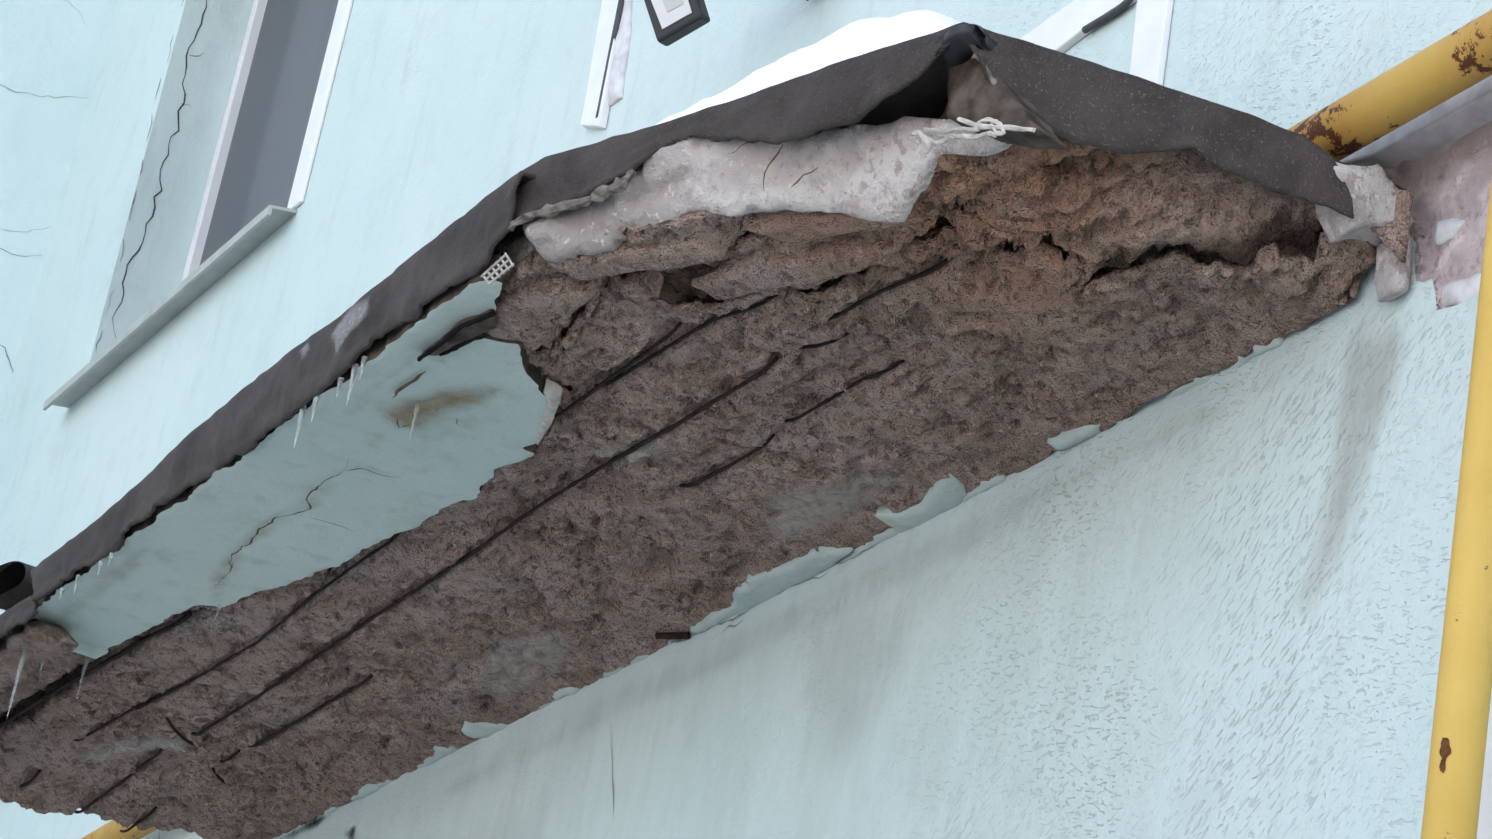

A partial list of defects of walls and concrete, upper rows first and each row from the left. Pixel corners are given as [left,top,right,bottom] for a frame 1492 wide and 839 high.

crack [0,226,51,257]
crack [0,84,88,98]
crack [96,0,207,349]
flaking render [1370,121,1492,310]
crack [215,459,397,588]
spalling [0,137,1377,839]